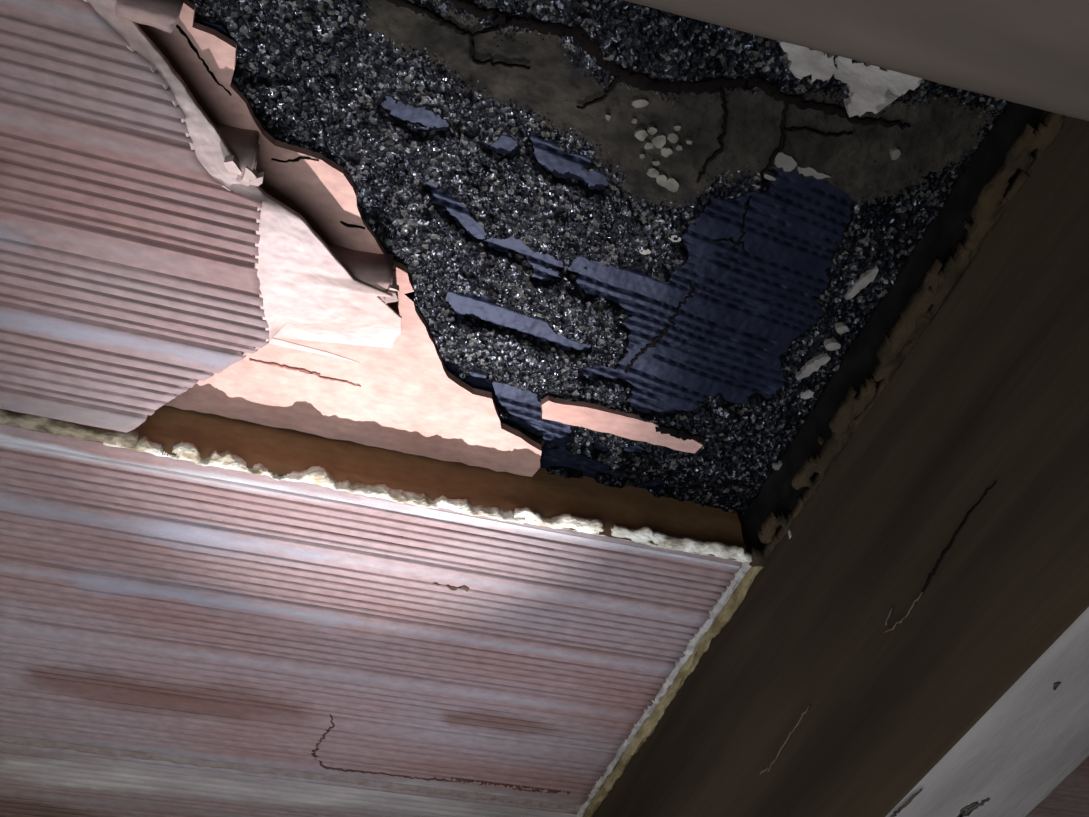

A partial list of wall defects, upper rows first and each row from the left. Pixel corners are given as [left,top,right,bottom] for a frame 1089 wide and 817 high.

spalling [83,0,402,363]
peeling [779,41,922,117]
spalling [746,111,1068,567]
crack [311,715,570,794]